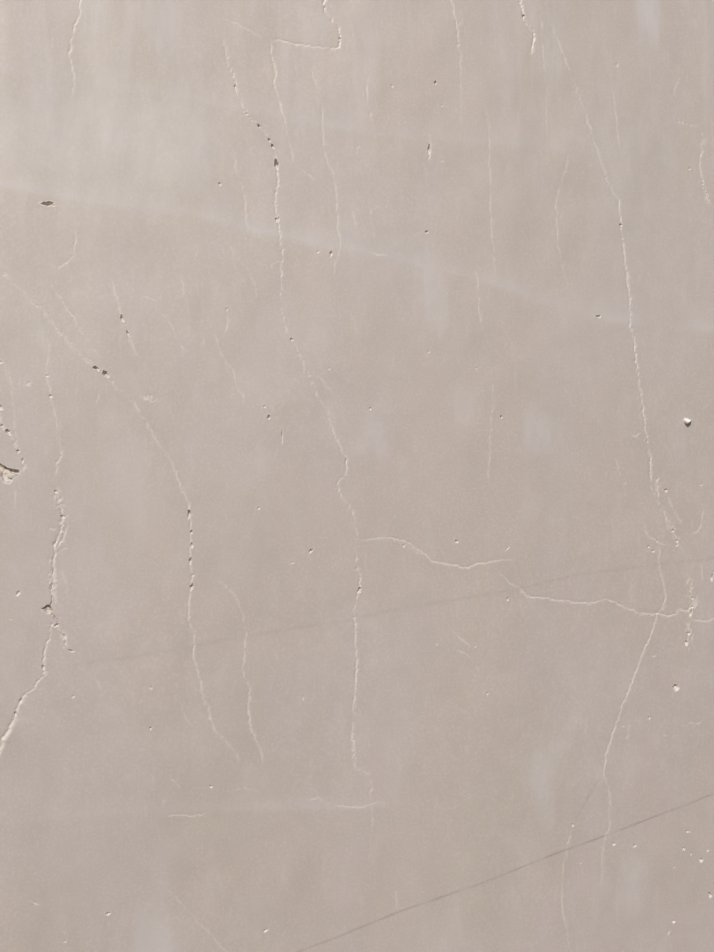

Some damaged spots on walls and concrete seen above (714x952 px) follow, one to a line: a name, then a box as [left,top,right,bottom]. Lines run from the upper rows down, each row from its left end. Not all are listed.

spalling [0,461,22,511]
crack [0,266,242,764]
crack [220,0,714,888]